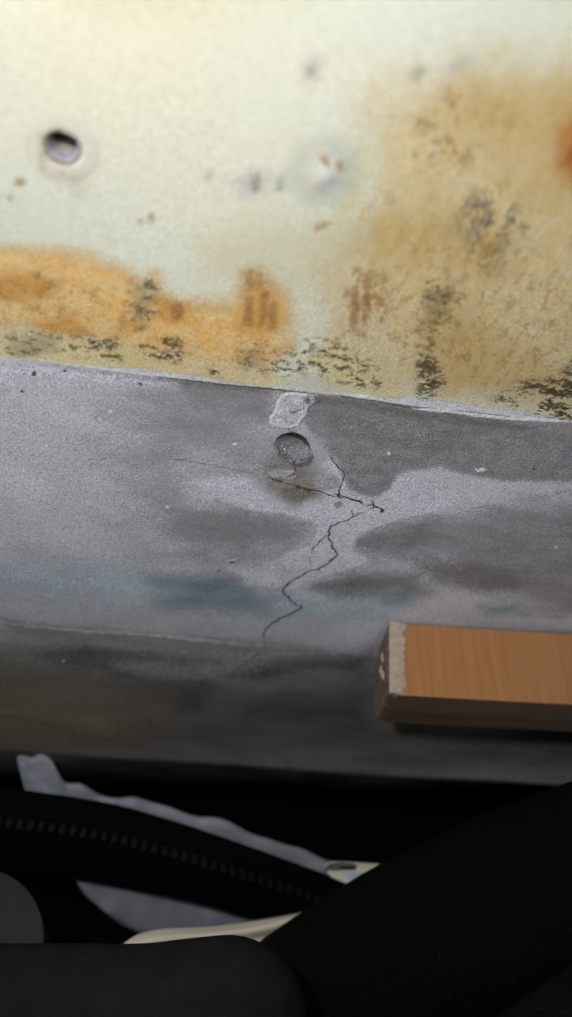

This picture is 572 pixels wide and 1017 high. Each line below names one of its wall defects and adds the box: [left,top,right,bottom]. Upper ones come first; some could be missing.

damp [0,50,572,620]
corrosion [344,268,390,336]
crack [170,456,384,645]